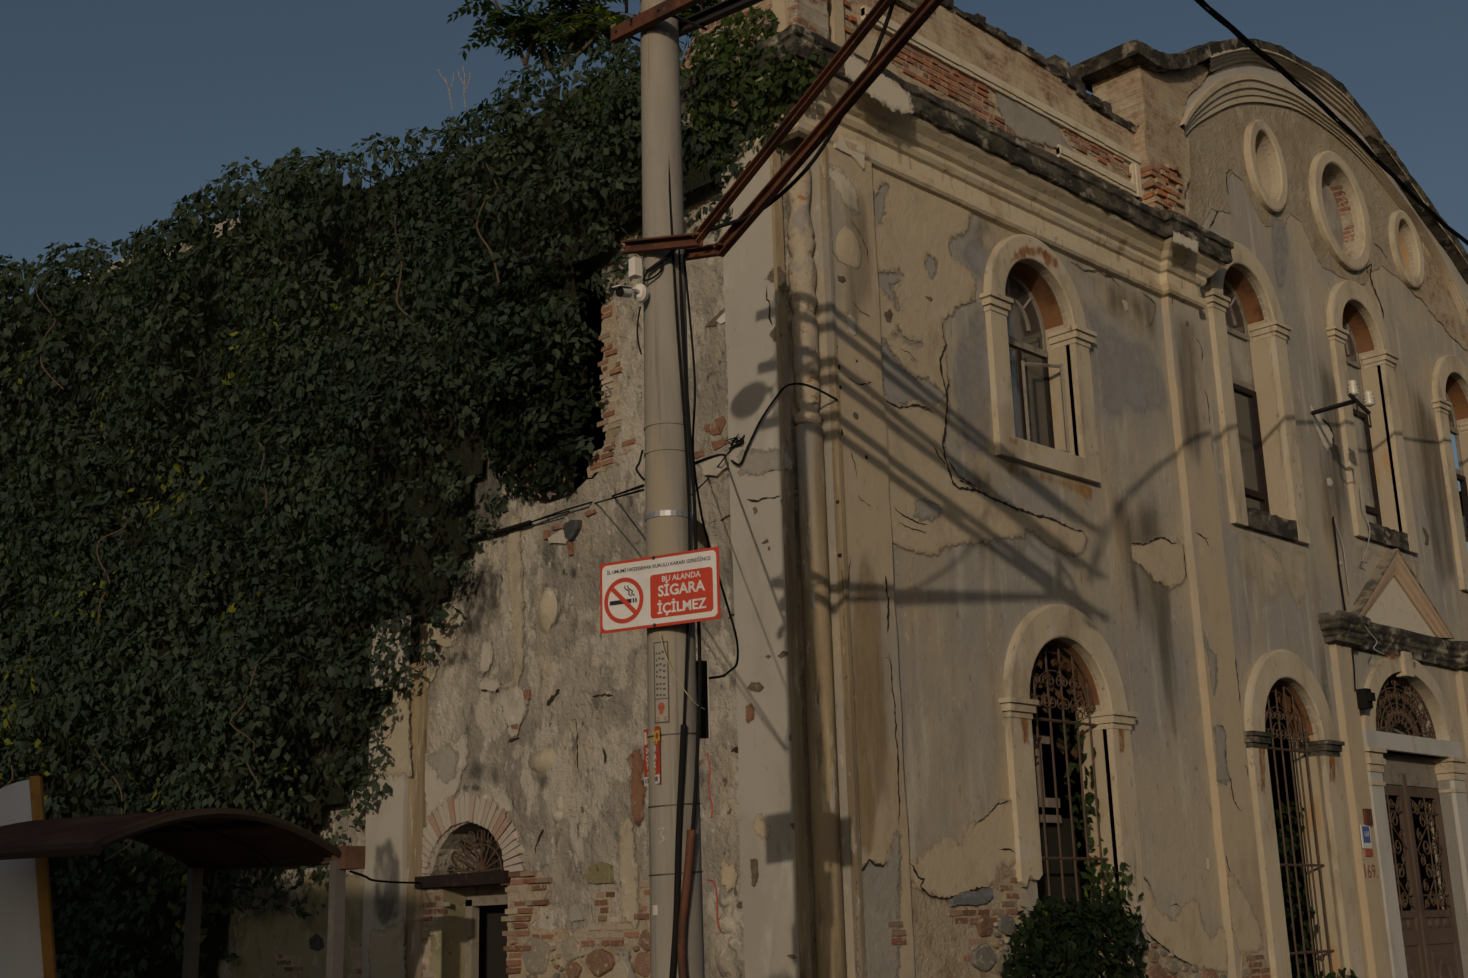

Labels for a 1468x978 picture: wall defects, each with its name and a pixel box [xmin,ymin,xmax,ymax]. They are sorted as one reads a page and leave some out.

flaking render [1062,128,1132,178]
peeling [823,136,1088,557]
crack [849,326,1087,546]
spalling [626,749,646,827]
spalling [854,798,1019,978]